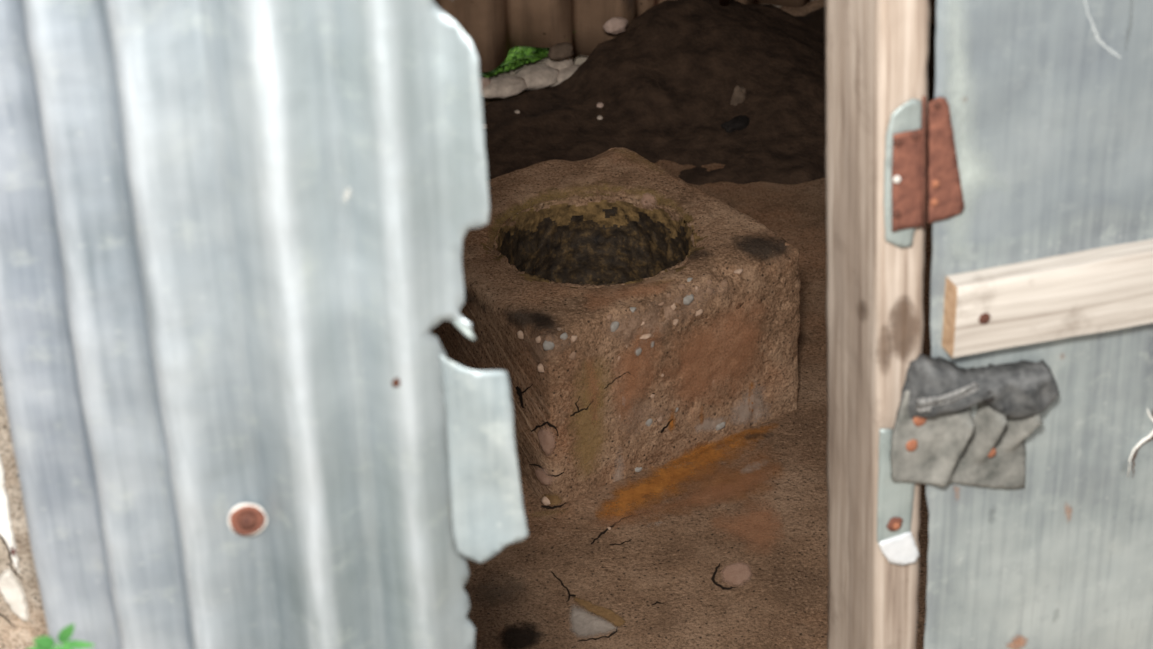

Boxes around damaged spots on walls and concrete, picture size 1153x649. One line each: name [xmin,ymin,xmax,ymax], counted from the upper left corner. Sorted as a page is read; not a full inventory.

crack [515,384,533,408]
crack [570,372,630,417]